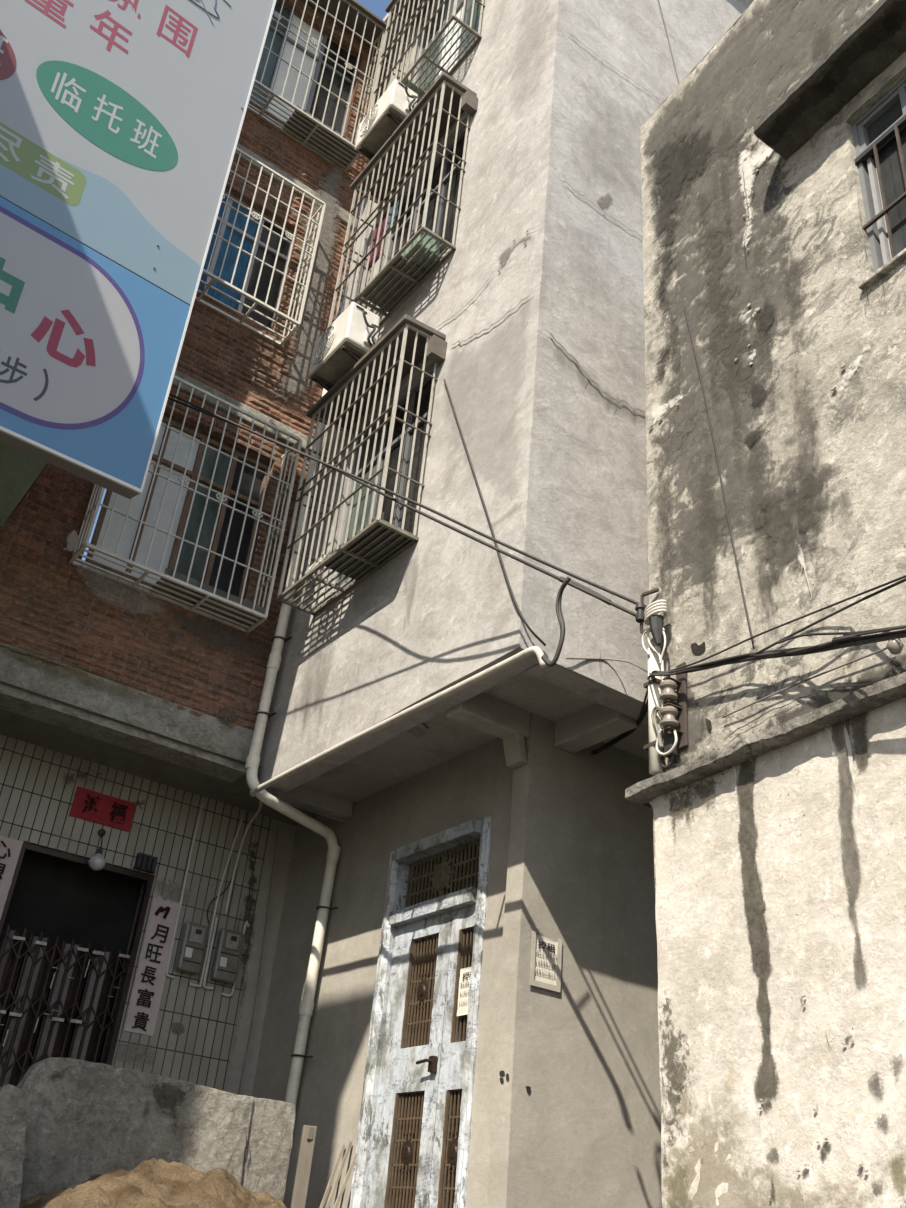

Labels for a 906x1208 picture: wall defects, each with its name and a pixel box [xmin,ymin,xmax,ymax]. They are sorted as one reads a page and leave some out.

leakage [643,0,906,406]
leakage [652,388,844,625]
leakage [665,757,779,1099]
leakage [825,712,868,986]
leakage [658,998,694,1167]